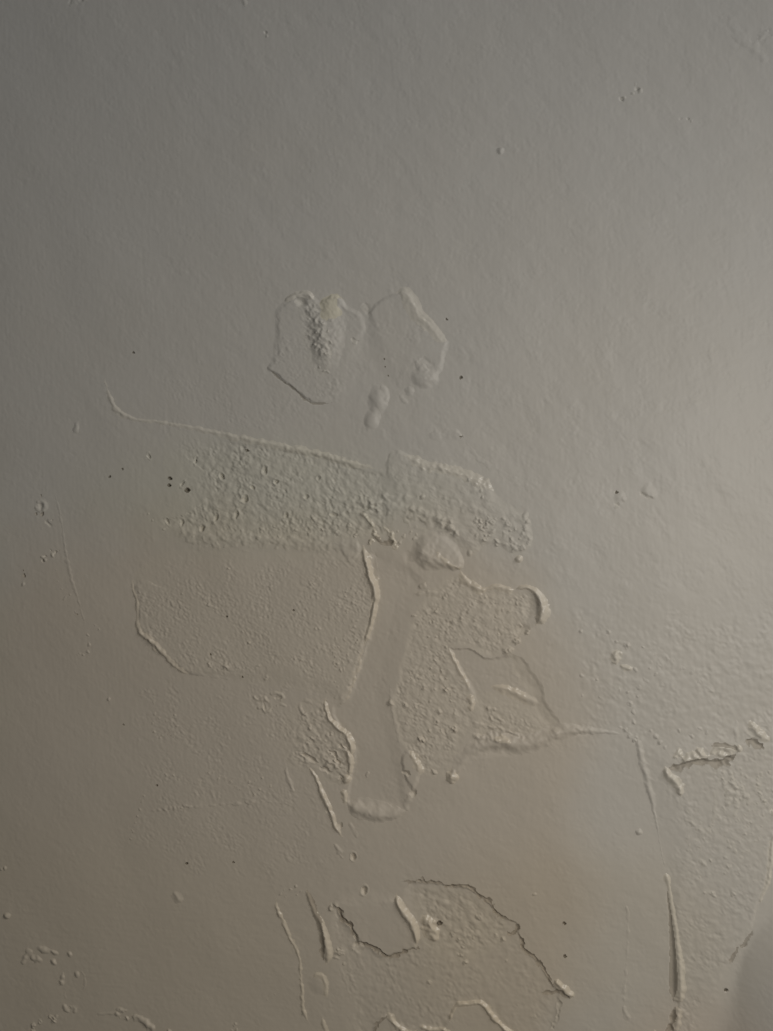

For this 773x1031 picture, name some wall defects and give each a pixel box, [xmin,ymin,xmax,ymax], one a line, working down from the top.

peeling [279,697,356,786]